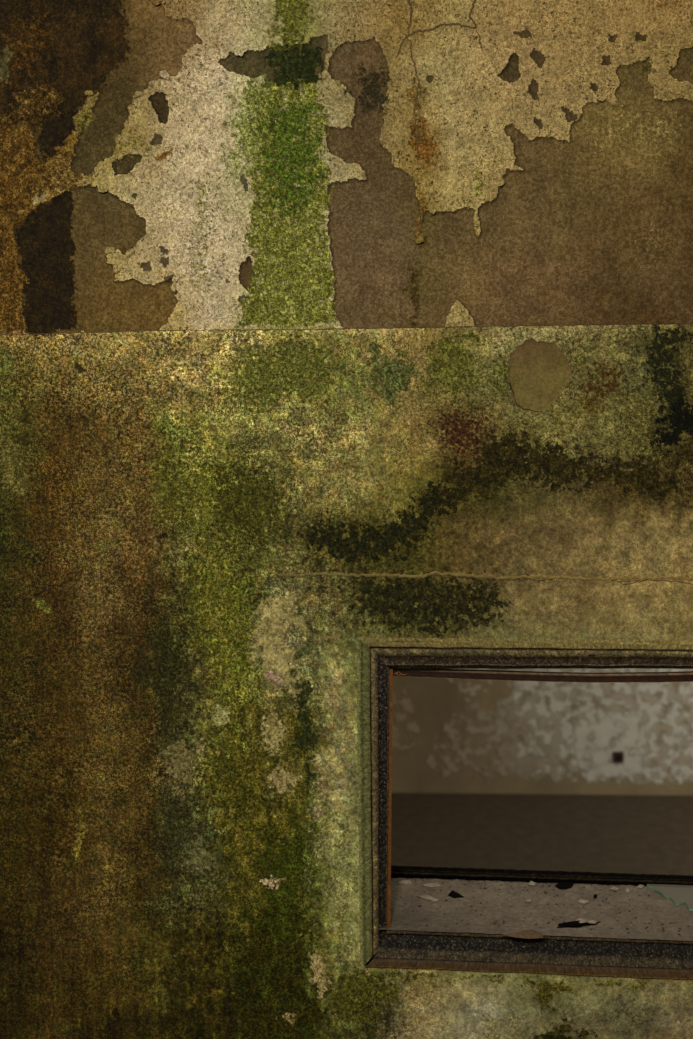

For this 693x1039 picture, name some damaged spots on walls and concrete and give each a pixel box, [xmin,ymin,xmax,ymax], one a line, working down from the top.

peeling [12,0,203,334]
peeling [218,28,693,328]
leakage [10,396,33,446]
leakage [297,319,693,639]
crack [275,571,693,585]
leakage [141,615,206,759]
leakage [282,648,321,783]
leakage [142,785,228,903]
leakage [249,819,323,952]
leakage [482,1003,598,1039]